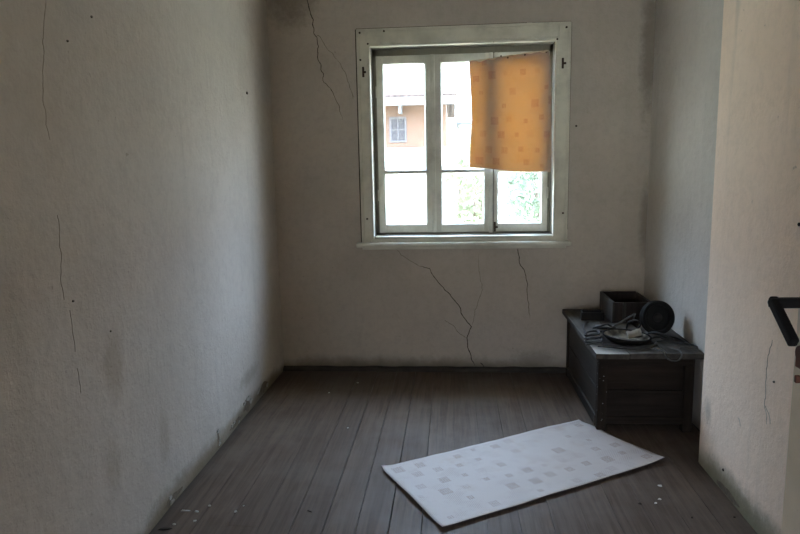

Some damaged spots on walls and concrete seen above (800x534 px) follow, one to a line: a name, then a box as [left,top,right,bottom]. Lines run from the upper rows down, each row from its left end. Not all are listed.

crack [307,0,353,120]
crack [57,215,75,344]
crack [396,249,484,367]
crack [764,344,772,424]